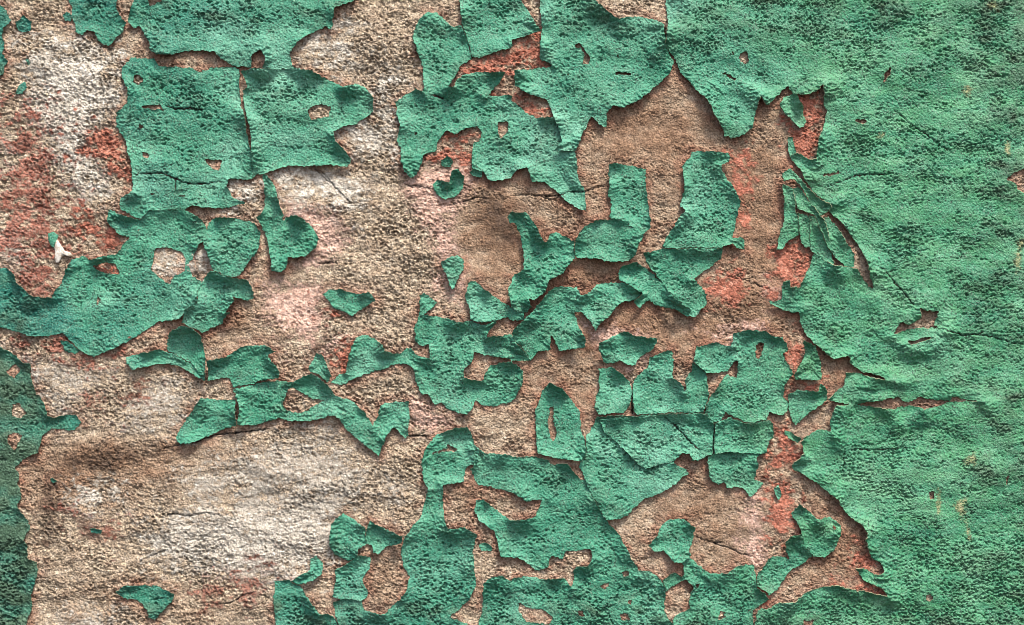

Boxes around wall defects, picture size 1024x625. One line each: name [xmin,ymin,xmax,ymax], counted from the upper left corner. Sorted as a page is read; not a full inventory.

peeling [596,0,668,33]
peeling [449,0,553,118]
peeling [575,43,590,64]
peeling [1007,169,1024,192]
peeling [0,0,531,625]
peeling [333,50,885,625]
peeling [894,308,939,344]
peeling [858,397,977,409]